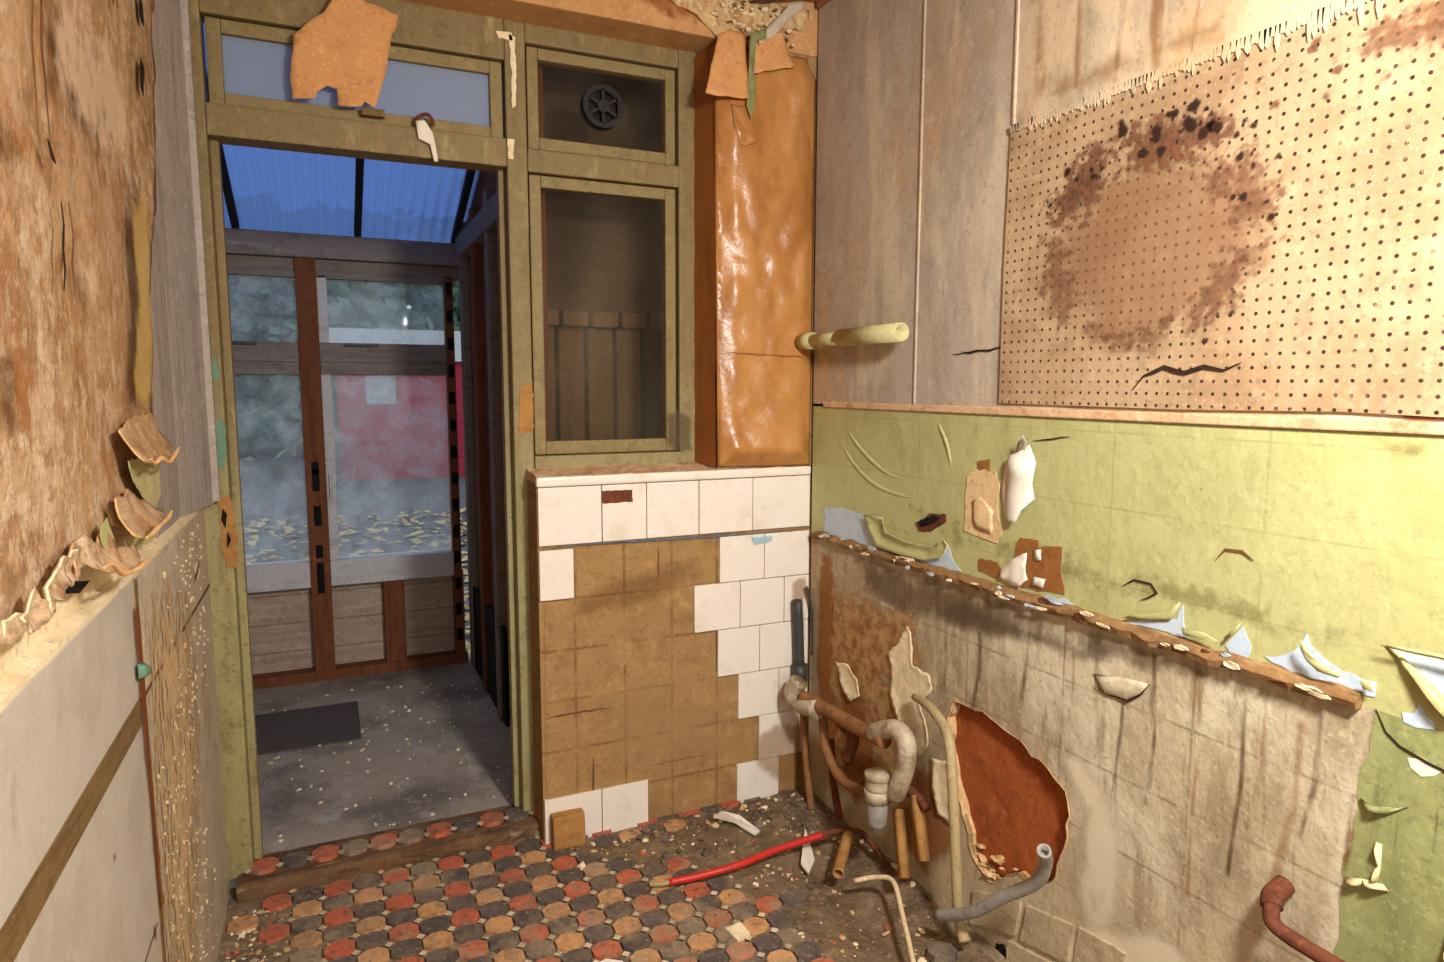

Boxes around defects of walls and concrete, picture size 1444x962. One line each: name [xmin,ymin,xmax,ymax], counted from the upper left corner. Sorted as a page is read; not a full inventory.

leakage [1365,0,1444,55]
leakage [1038,99,1286,326]
leakage [1085,241,1268,350]
crack [1132,362,1242,390]
peeling [0,548,84,647]
peeling [544,538,756,820]
leakage [828,567,1018,724]
flaking render [818,507,1111,632]
flaking render [1124,602,1377,700]
leakage [899,771,950,871]
spalling [888,626,1126,962]
crack [1376,709,1444,772]